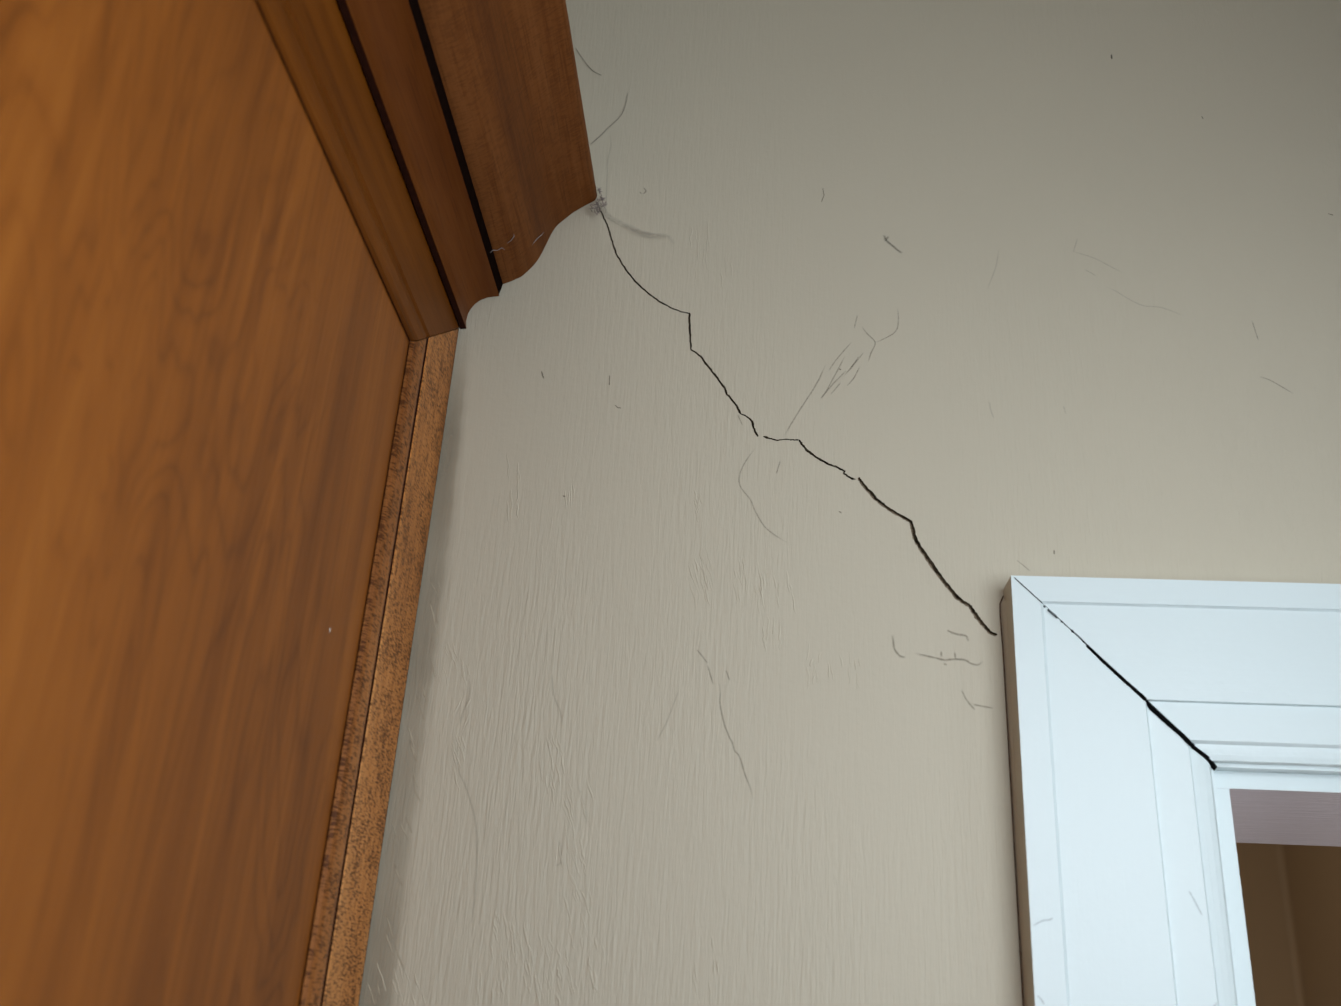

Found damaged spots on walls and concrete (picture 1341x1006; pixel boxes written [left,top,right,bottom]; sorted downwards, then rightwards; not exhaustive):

crack [596,201,997,636]